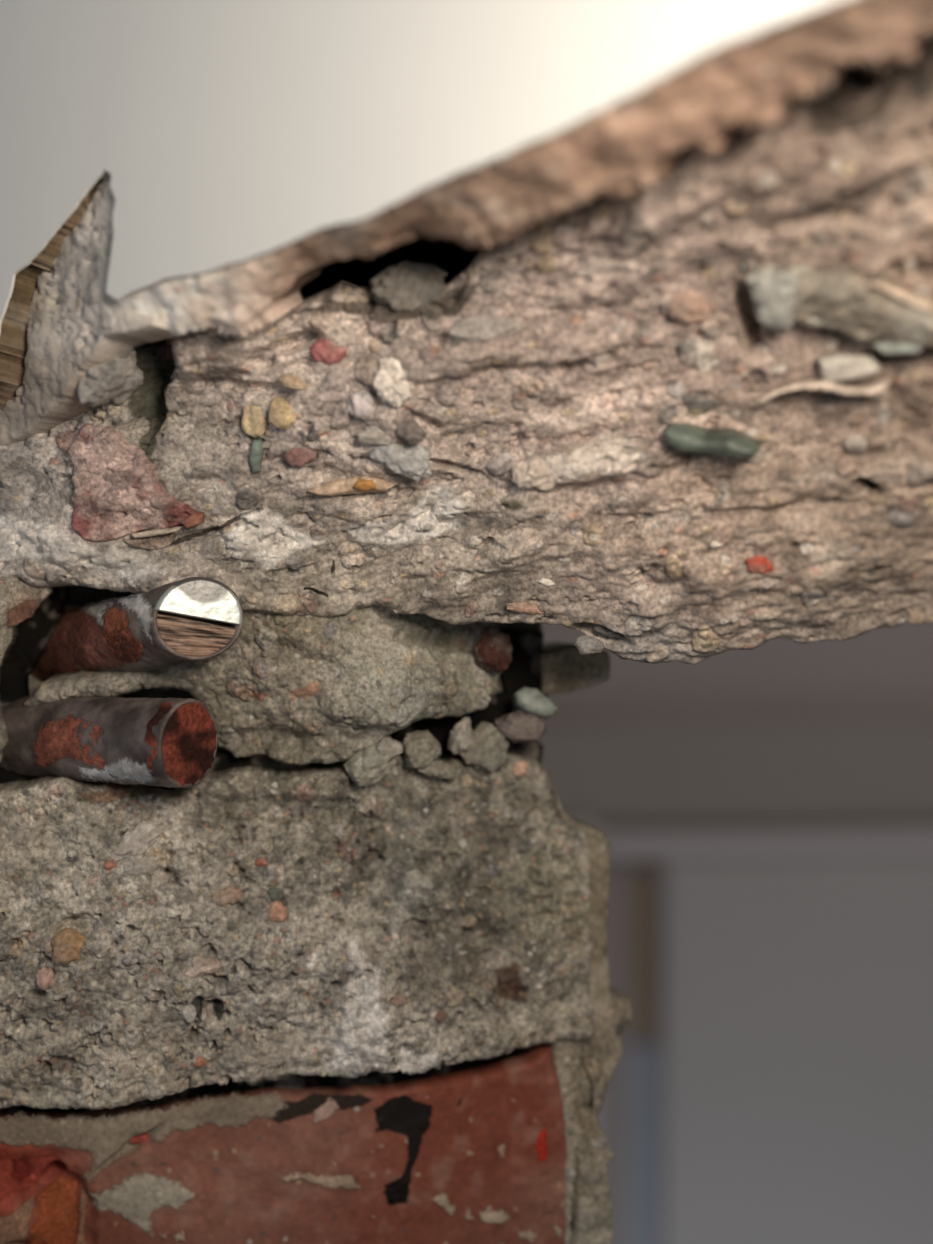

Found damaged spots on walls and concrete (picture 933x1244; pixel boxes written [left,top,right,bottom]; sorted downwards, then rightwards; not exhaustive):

spalling [809,61,904,135]
spalling [0,176,188,455]
spalling [299,236,482,323]
peeling [746,262,933,405]
corrosion [8,600,39,627]
corrosion [31,607,143,682]
spalling [507,602,544,614]
corrosion [33,714,105,771]
corrosion [144,701,217,786]
spalling [513,761,528,778]
crack [0,1044,537,1115]
spalling [0,1150,88,1244]